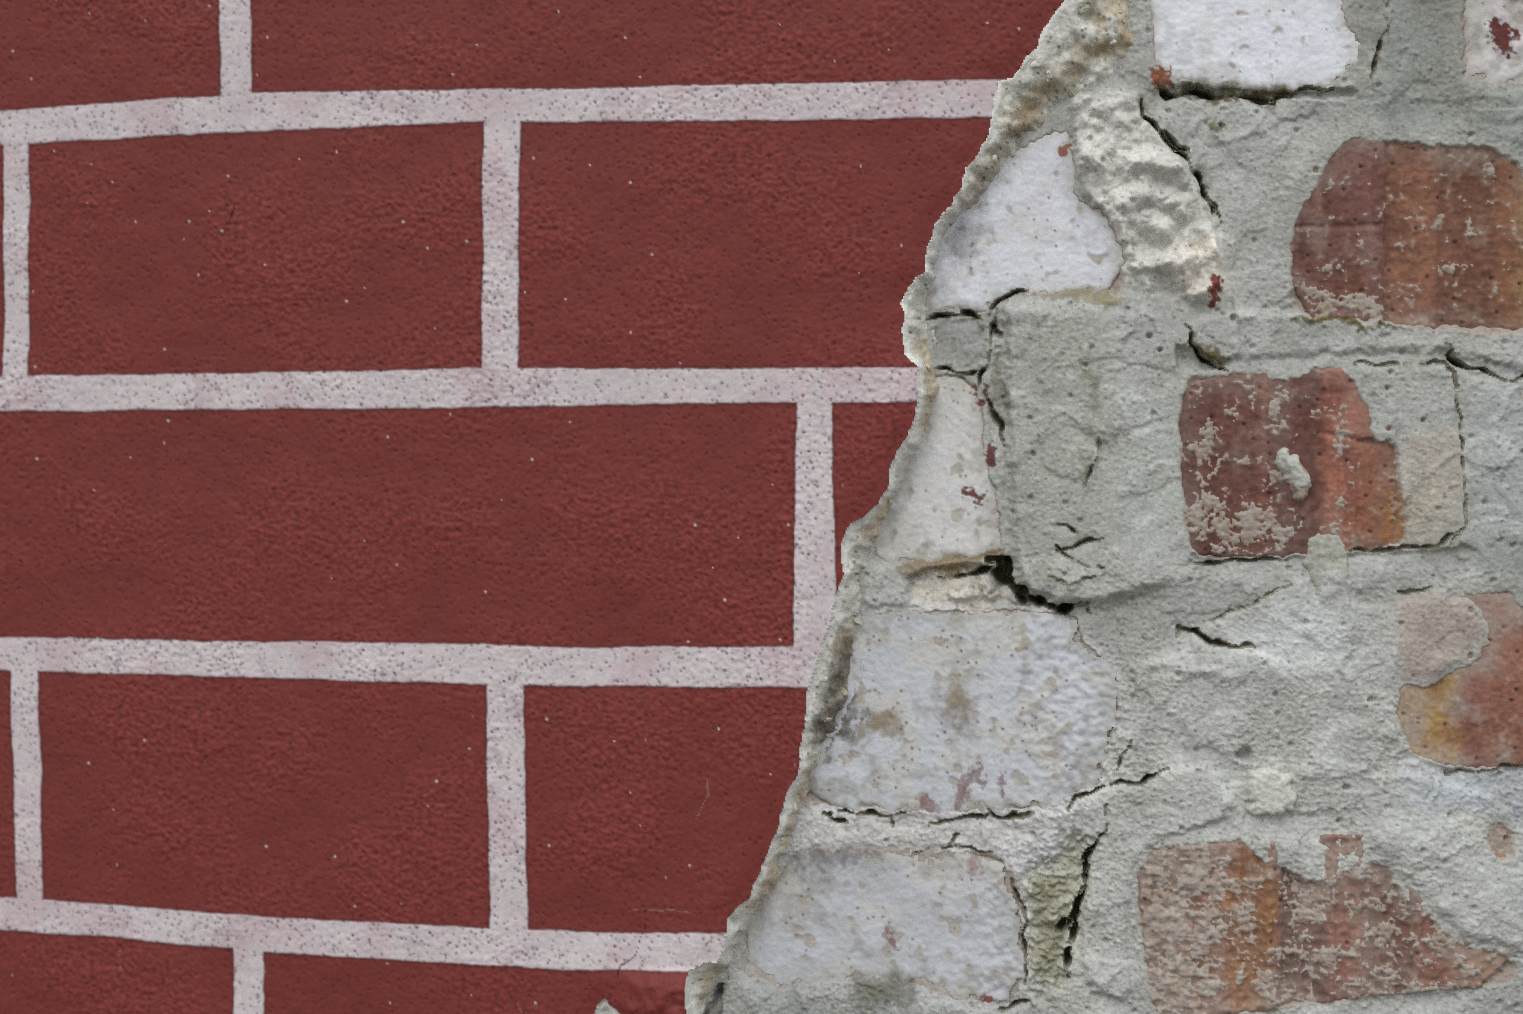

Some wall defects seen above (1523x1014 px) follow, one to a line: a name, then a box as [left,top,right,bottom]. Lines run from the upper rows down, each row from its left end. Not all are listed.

crack [1370,0,1390,85]
peeling [1462,0,1523,85]
crack [1138,82,1335,223]
crack [925,288,1029,456]
peeling [685,0,1360,1014]
crack [1083,436,1102,487]
crack [937,523,1105,615]
crack [821,739,1170,1013]
flaking render [594,998,620,1014]